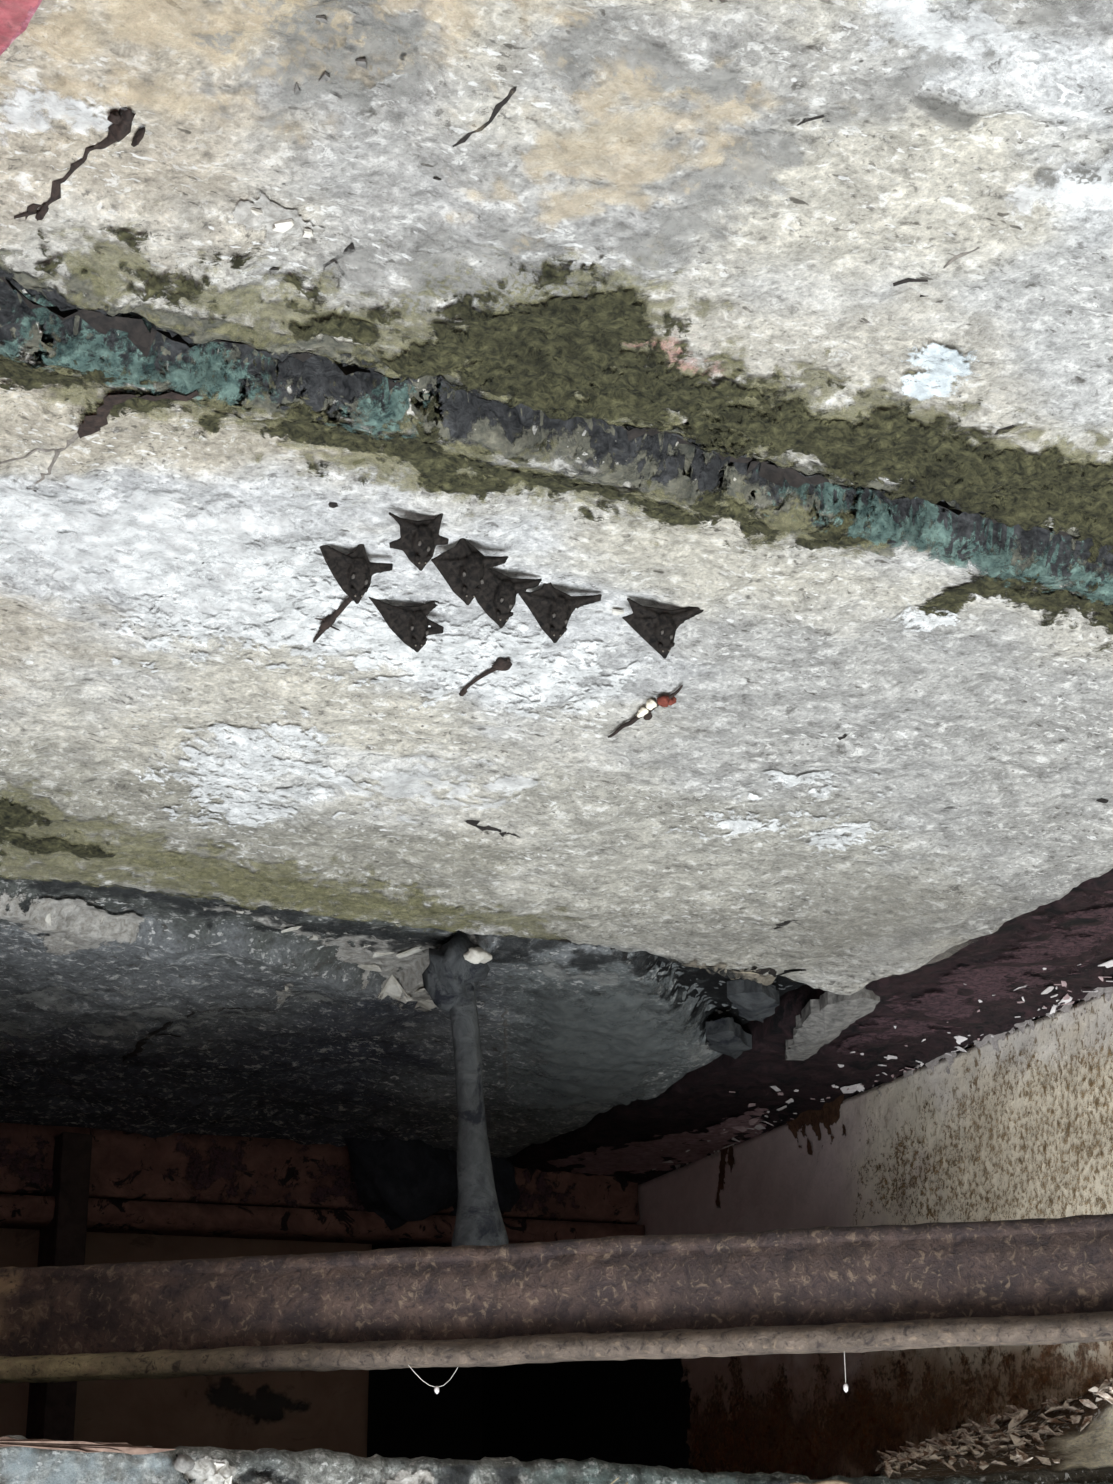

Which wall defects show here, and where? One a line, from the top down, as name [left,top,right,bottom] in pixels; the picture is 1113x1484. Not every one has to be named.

crack [14,107,145,221]
crack [0,390,199,490]
leakage [0,250,1113,605]
crack [994,425,1015,435]
crack [134,562,204,626]
leakage [0,476,673,731]
leakage [886,606,960,650]
corrosion [0,1016,1113,1480]